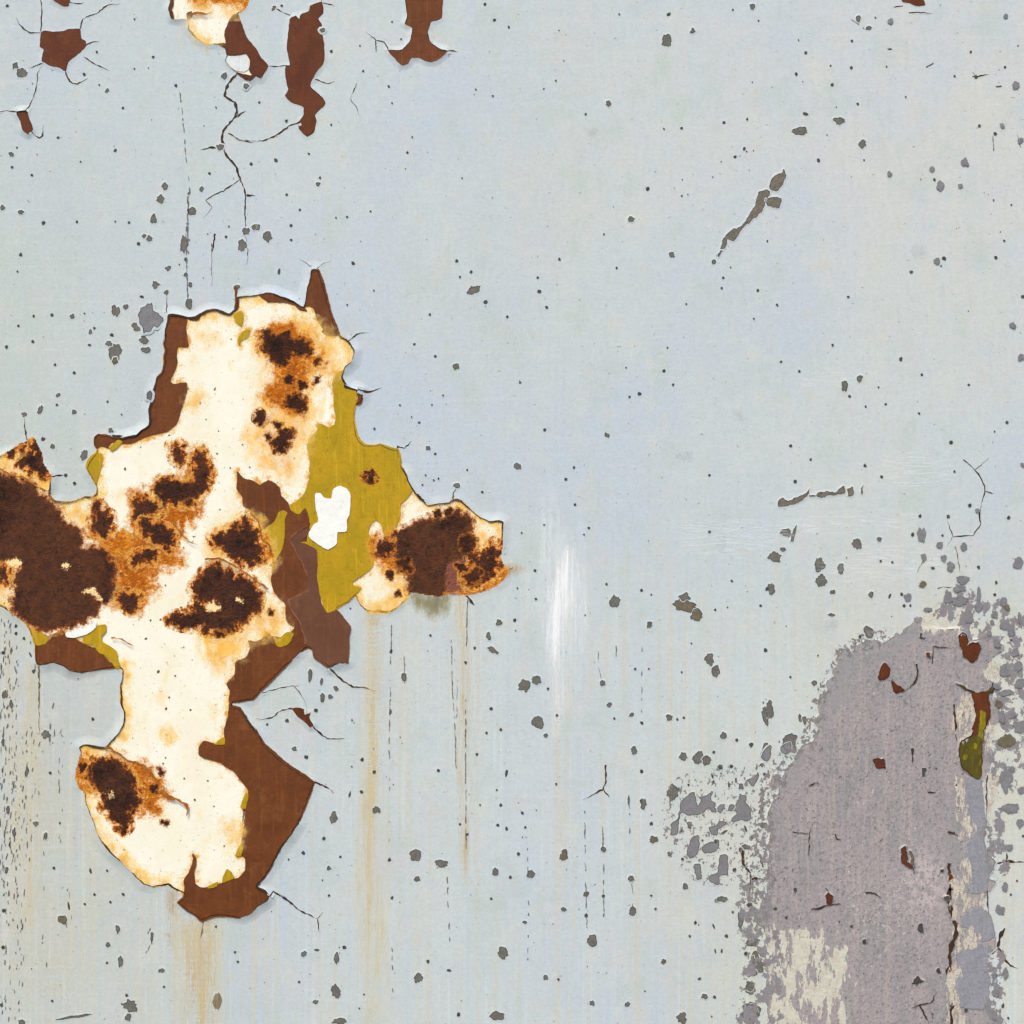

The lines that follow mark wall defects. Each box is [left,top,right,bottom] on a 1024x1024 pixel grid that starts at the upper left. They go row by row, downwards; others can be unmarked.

peeling [0,0,120,140]
peeling [162,0,335,143]
peeling [365,0,459,71]
crack [200,71,262,300]
spalling [764,167,788,210]
spalling [808,483,866,500]
crack [916,457,994,590]
peeling [0,261,515,927]
crack [262,684,310,714]
peeling [648,523,1024,1024]